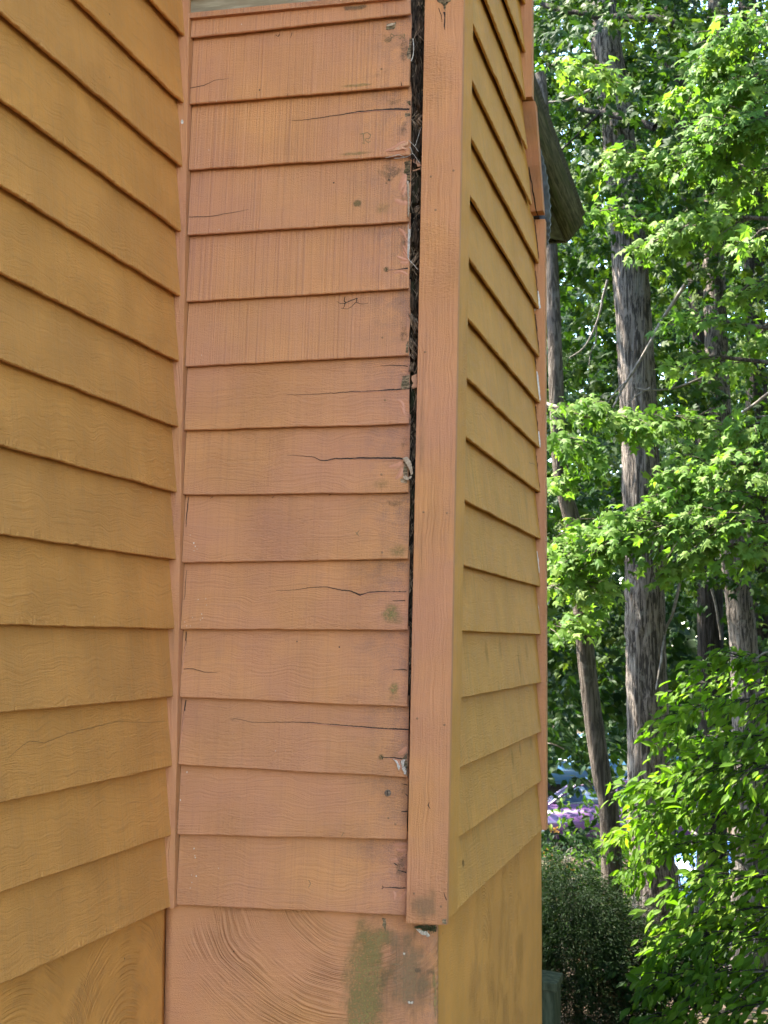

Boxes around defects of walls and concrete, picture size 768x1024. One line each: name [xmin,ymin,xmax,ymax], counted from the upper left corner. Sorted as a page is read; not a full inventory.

crack [292,108,410,121]
crack [287,365,410,395]
crack [295,454,403,462]
crack [276,586,406,601]
crack [234,718,409,731]